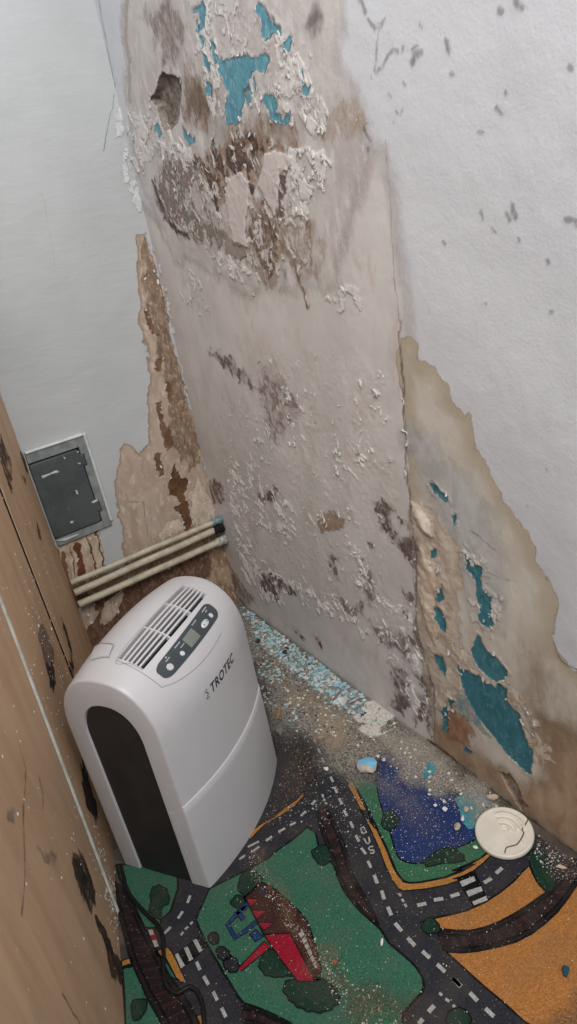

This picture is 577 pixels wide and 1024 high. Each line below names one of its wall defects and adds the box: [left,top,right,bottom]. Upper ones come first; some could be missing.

flaking render [114,0,332,296]
flaking render [154,382,215,541]
damp [70,0,577,853]
peeling [427,483,456,526]
damp [61,618,74,673]
flaking render [79,589,125,630]
peeling [433,554,533,808]
peeling [423,761,436,779]
damp [72,851,122,985]